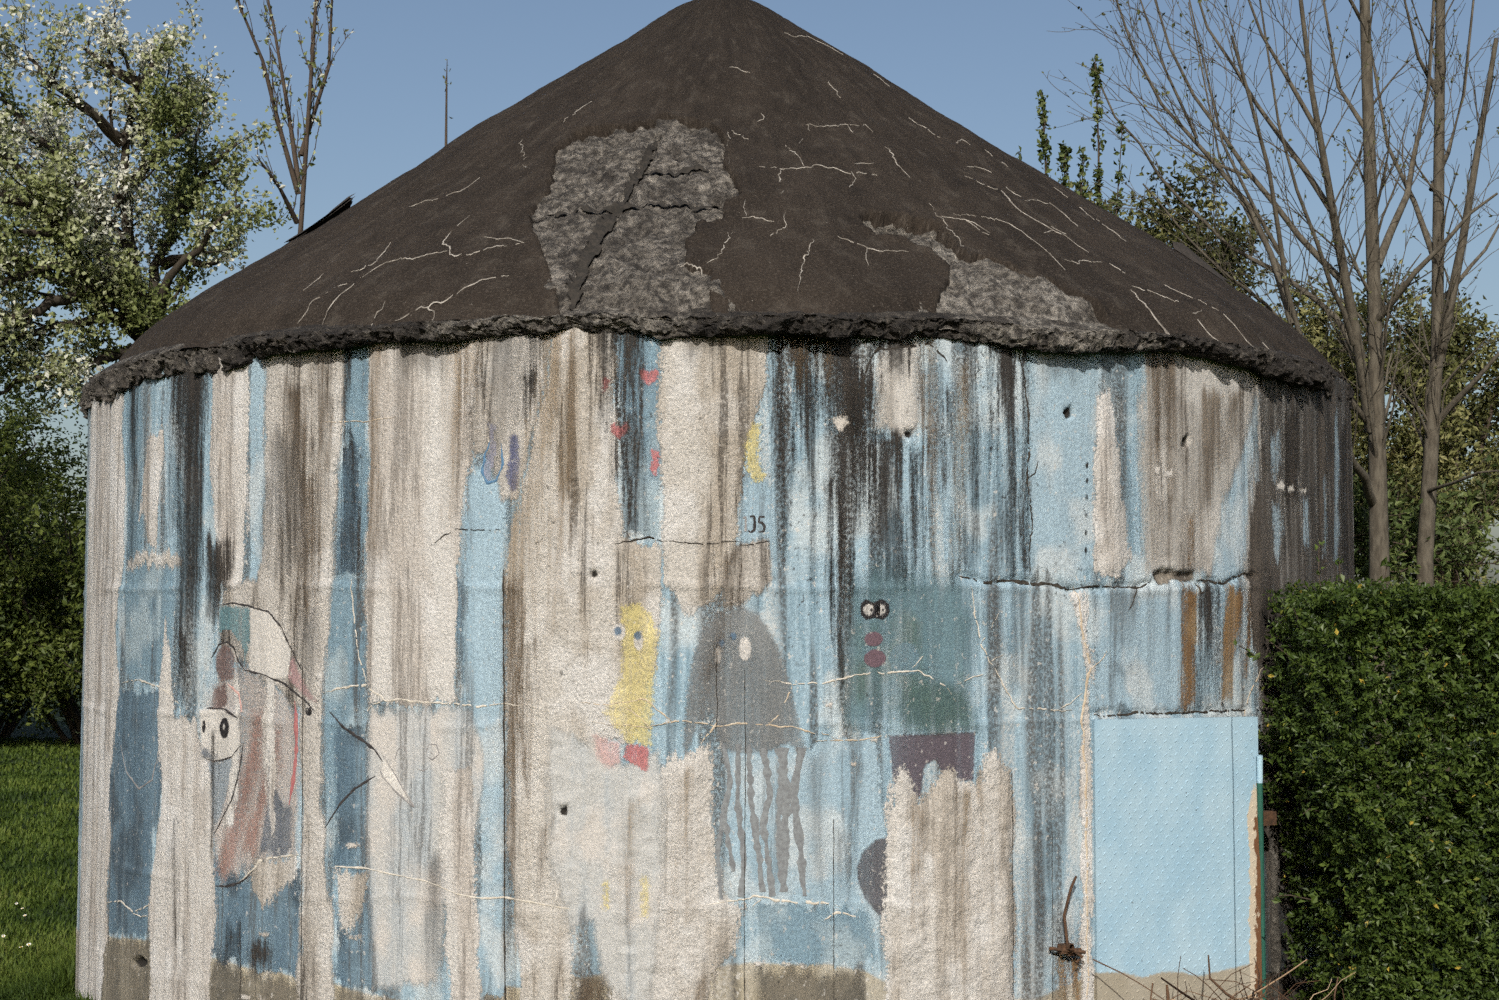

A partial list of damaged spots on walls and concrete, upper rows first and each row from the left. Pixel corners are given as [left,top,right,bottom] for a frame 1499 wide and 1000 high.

crack [299,177,524,325]
crack [678,33,1269,349]
spalling [863,221,1108,330]
leakage [169,359,234,699]
peeling [148,348,370,1000]
peeling [362,119,772,1000]
leakage [771,334,1032,689]
crack [581,342,1263,999]
rust [1178,583,1200,712]
rust [1222,583,1251,699]
leakage [1202,374,1358,1000]
peeling [877,747,1019,1000]